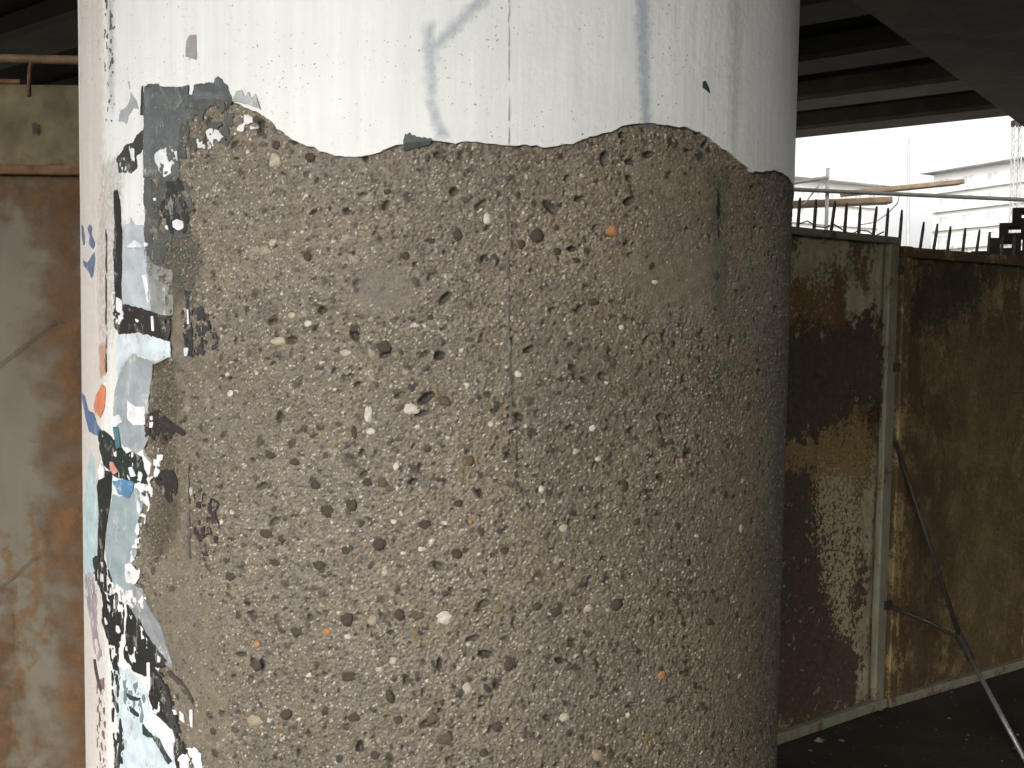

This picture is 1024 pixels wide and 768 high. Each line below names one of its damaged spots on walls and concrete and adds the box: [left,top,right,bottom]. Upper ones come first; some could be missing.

rust [0,175,86,768]
spalling [85,0,873,768]
rust [786,271,885,458]